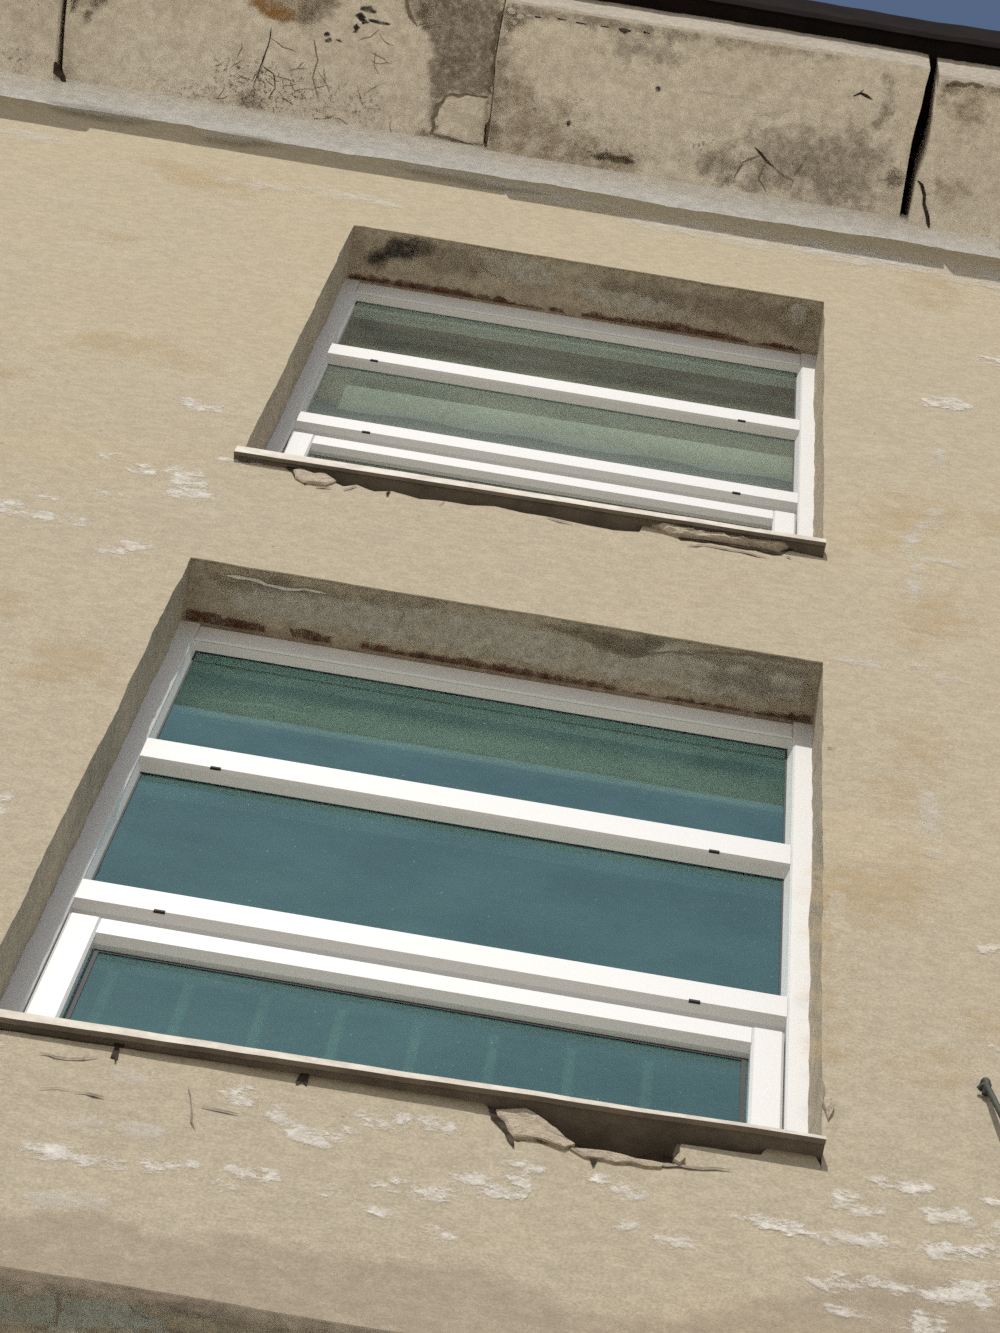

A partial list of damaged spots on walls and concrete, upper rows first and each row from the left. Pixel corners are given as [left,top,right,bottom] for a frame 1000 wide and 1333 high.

rust [255,0,303,19]
crack [53,62,66,82]
crack [213,0,456,131]
damp [421,0,498,109]
flaking render [429,93,488,145]
crack [918,181,930,228]
peeling [652,523,792,558]
rust [185,610,265,632]
rust [289,628,331,643]
rust [361,643,811,723]
peeling [216,1165,279,1189]
flaking render [414,1107,731,1201]